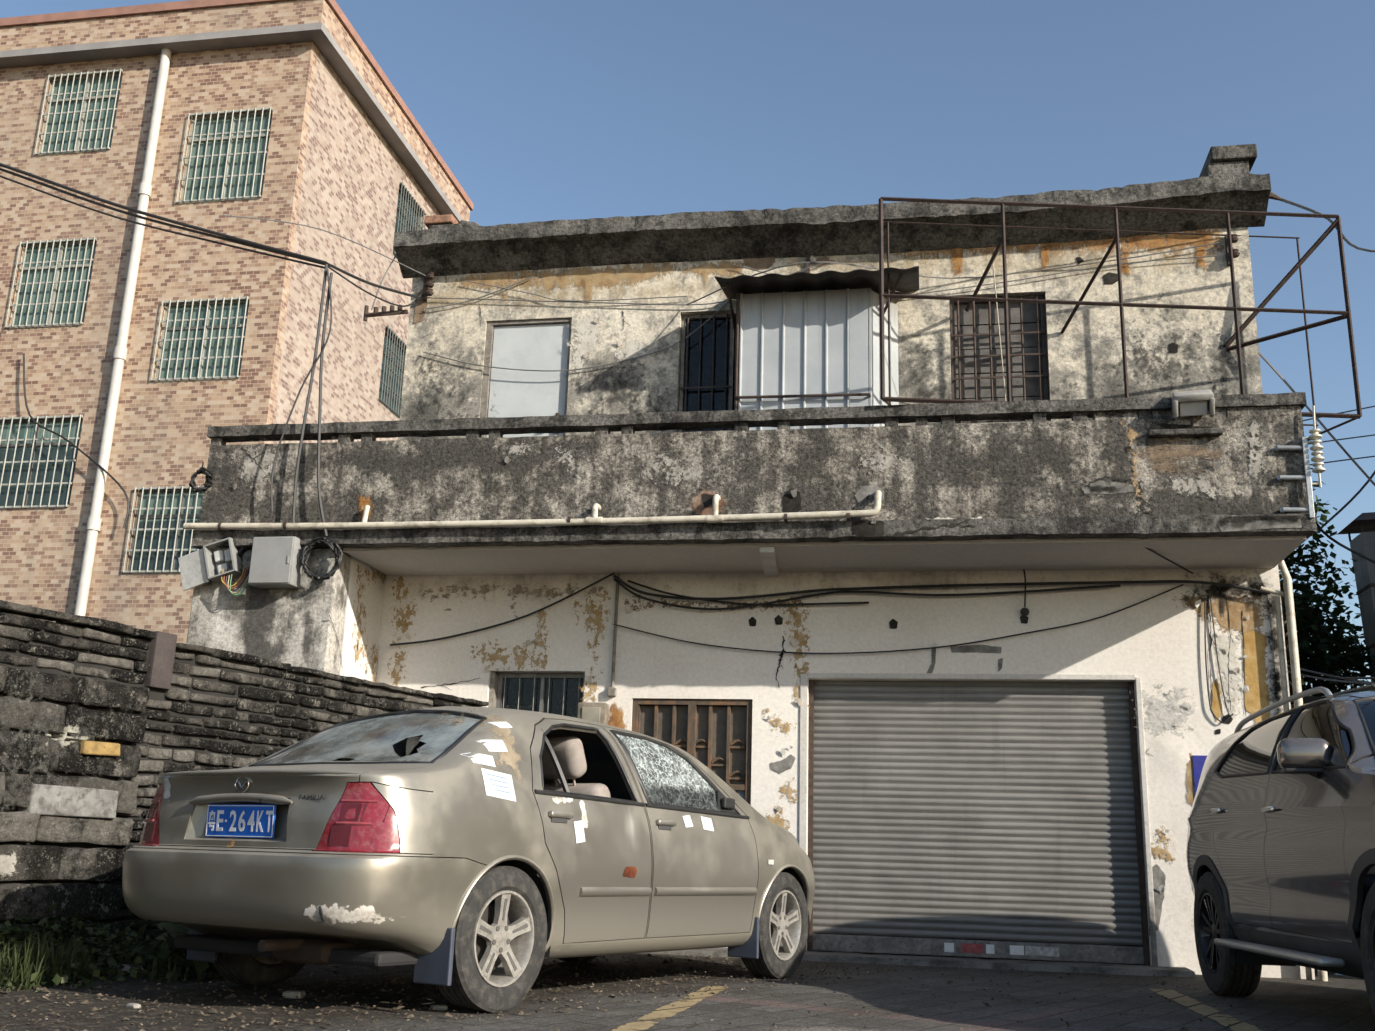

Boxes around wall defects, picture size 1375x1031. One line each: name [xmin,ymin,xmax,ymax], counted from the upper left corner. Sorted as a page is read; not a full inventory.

rust [885,228,1223,275]
leakage [434,261,744,308]
leakage [1096,297,1246,395]
leakage [641,451,708,490]
leakage [857,440,915,474]
peeling [470,610,550,672]
spalling [1135,594,1271,748]
peeling [574,590,810,830]